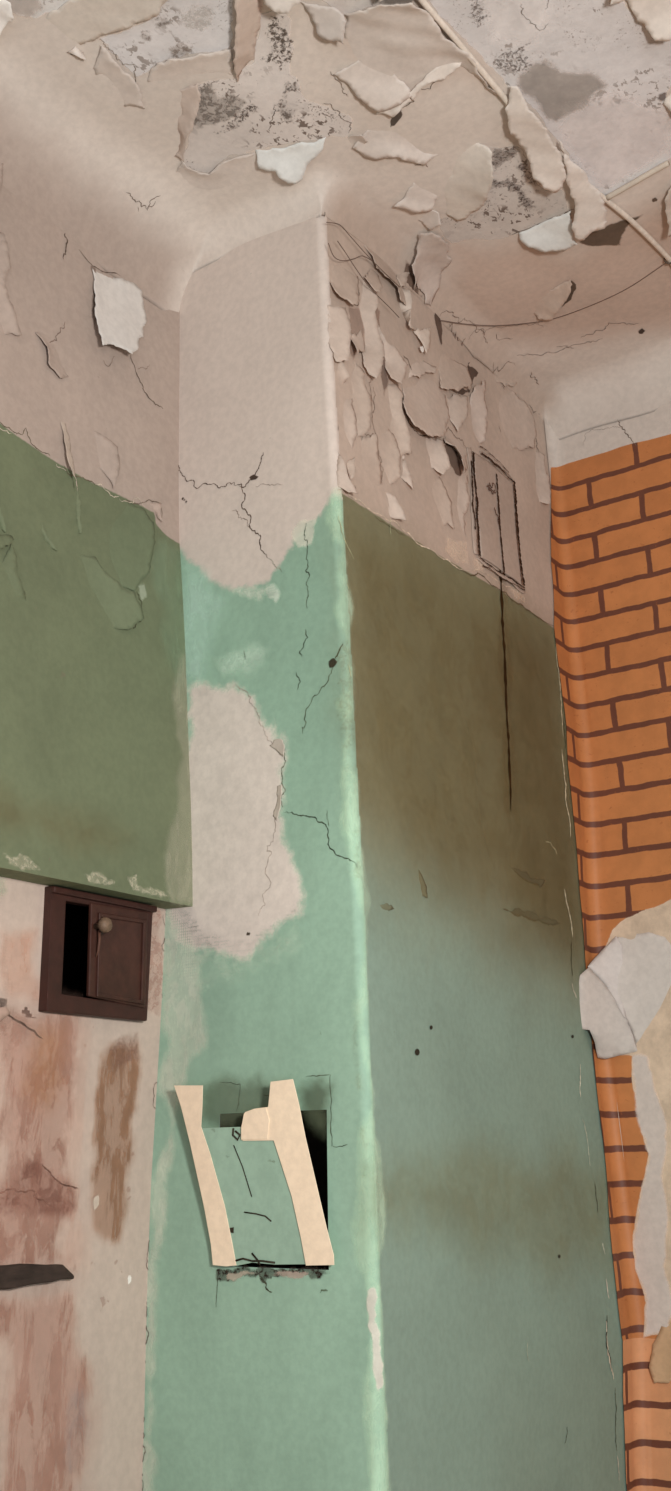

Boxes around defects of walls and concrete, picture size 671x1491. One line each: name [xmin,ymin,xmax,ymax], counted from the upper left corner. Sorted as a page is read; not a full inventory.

peeling [0,0,671,536]
peeling [88,684,302,958]
crack [290,811,357,866]
crack [178,455,571,837]
crack [564,889,577,998]
crack [580,1064,619,1473]